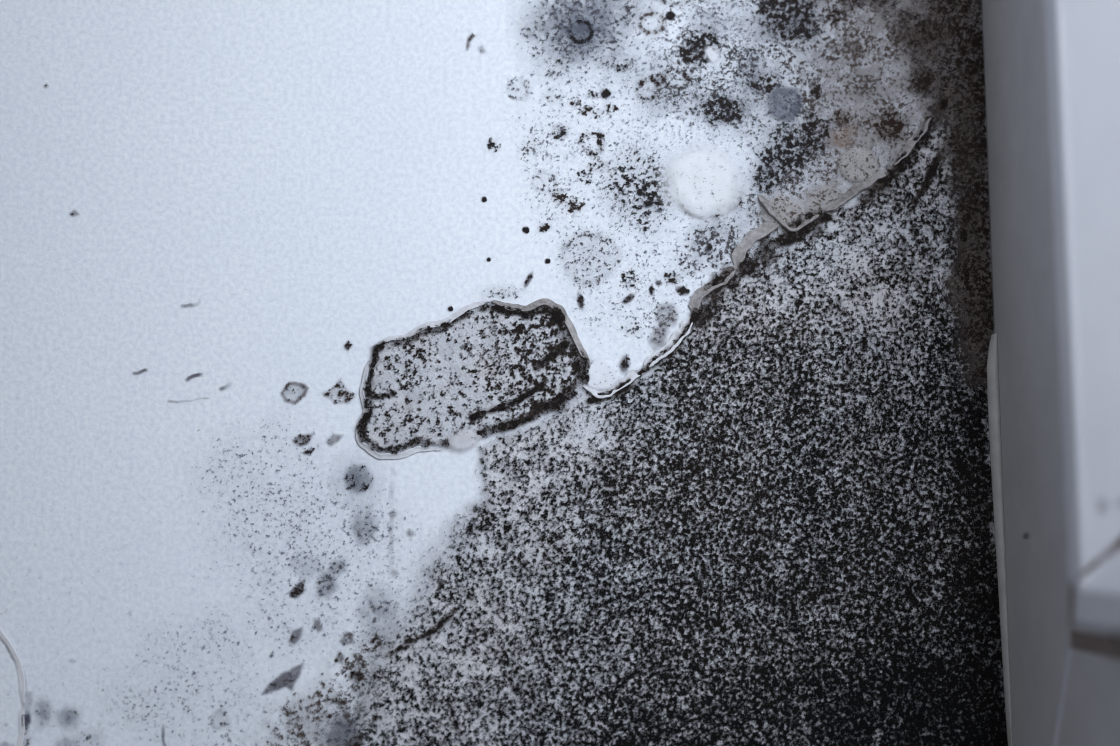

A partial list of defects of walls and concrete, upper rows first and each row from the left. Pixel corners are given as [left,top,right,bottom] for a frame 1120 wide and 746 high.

damp [508,0,994,388]
crack [0,628,30,746]
damp [114,424,412,746]
spalling [256,96,1008,746]